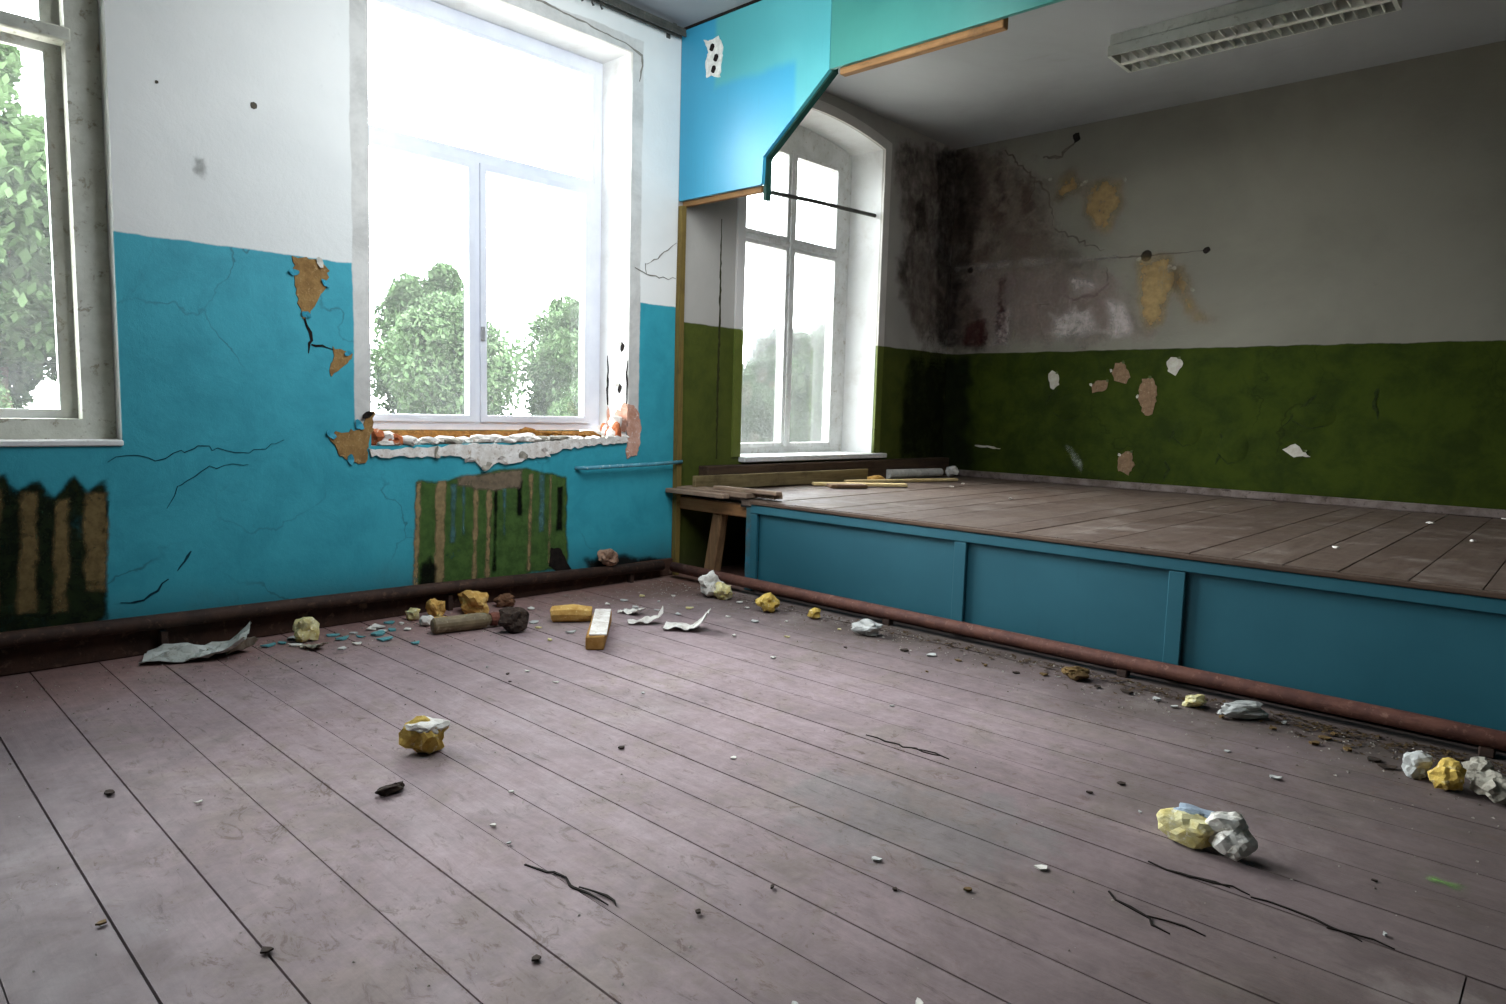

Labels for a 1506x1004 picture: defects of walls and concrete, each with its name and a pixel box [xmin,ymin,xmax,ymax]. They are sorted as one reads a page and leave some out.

peeling [289,256,330,319]
leakage [902,147,1131,467]
peeling [1136,250,1179,327]
peeling [329,347,353,377]
spalling [1048,371,1059,390]
spalling [1089,357,1183,416]
crack [108,440,283,508]
flaking render [327,410,417,465]
flaking render [465,447,551,470]
spalling [1117,450,1135,476]
crack [120,551,192,603]